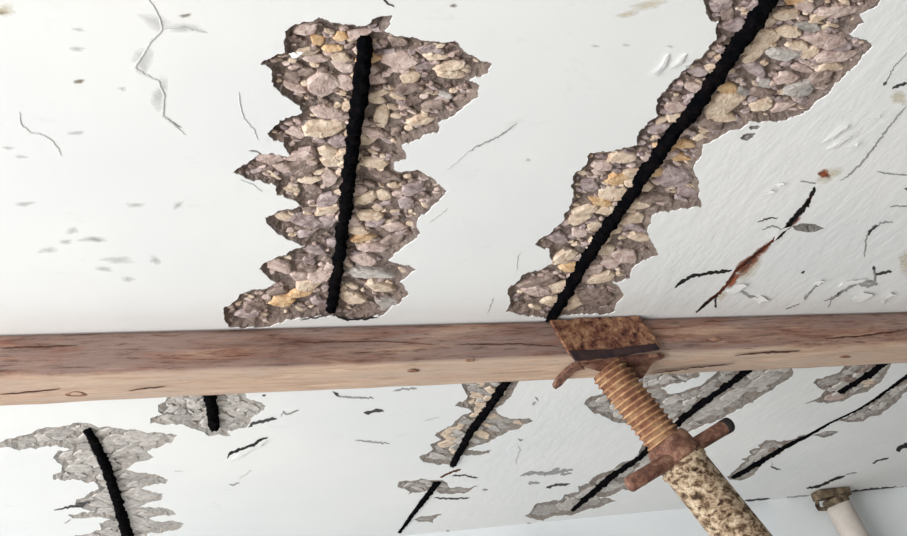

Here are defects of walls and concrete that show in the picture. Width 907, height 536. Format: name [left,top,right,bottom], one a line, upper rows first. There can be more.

crack [133,0,206,135]
crack [19,113,61,156]
spalling [223,15,492,328]
spalling [506,0,880,318]
crack [786,53,907,309]
rust [727,245,768,287]
spalling [0,393,265,536]
spalling [419,381,532,465]
spalling [526,444,651,521]
spalling [639,368,793,432]
spalling [727,379,907,481]
spalling [808,363,891,403]